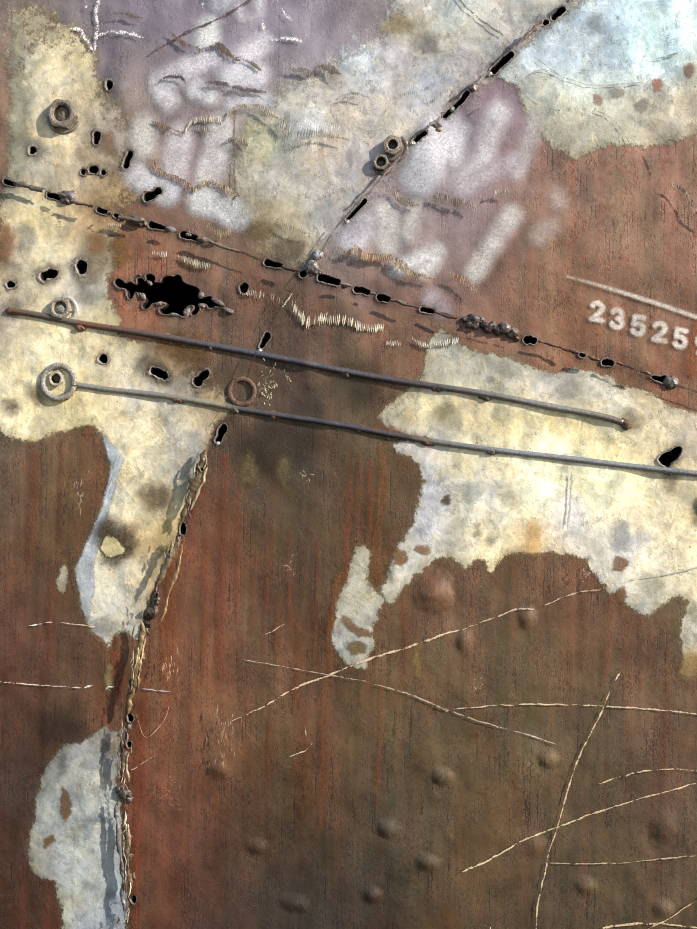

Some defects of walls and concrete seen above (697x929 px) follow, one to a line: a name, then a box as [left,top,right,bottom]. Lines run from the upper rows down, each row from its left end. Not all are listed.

crack [459,0,510,43]
crack [530,59,643,86]
peeling [491,0,697,160]
spalling [319,276,341,286]
spalling [355,288,390,302]
peeling [0,0,233,648]
peeling [330,326,697,678]
rust [393,545,429,565]
rust [613,556,629,571]
rust [616,587,627,605]
rust [342,615,371,655]
peeling [27,725,136,929]